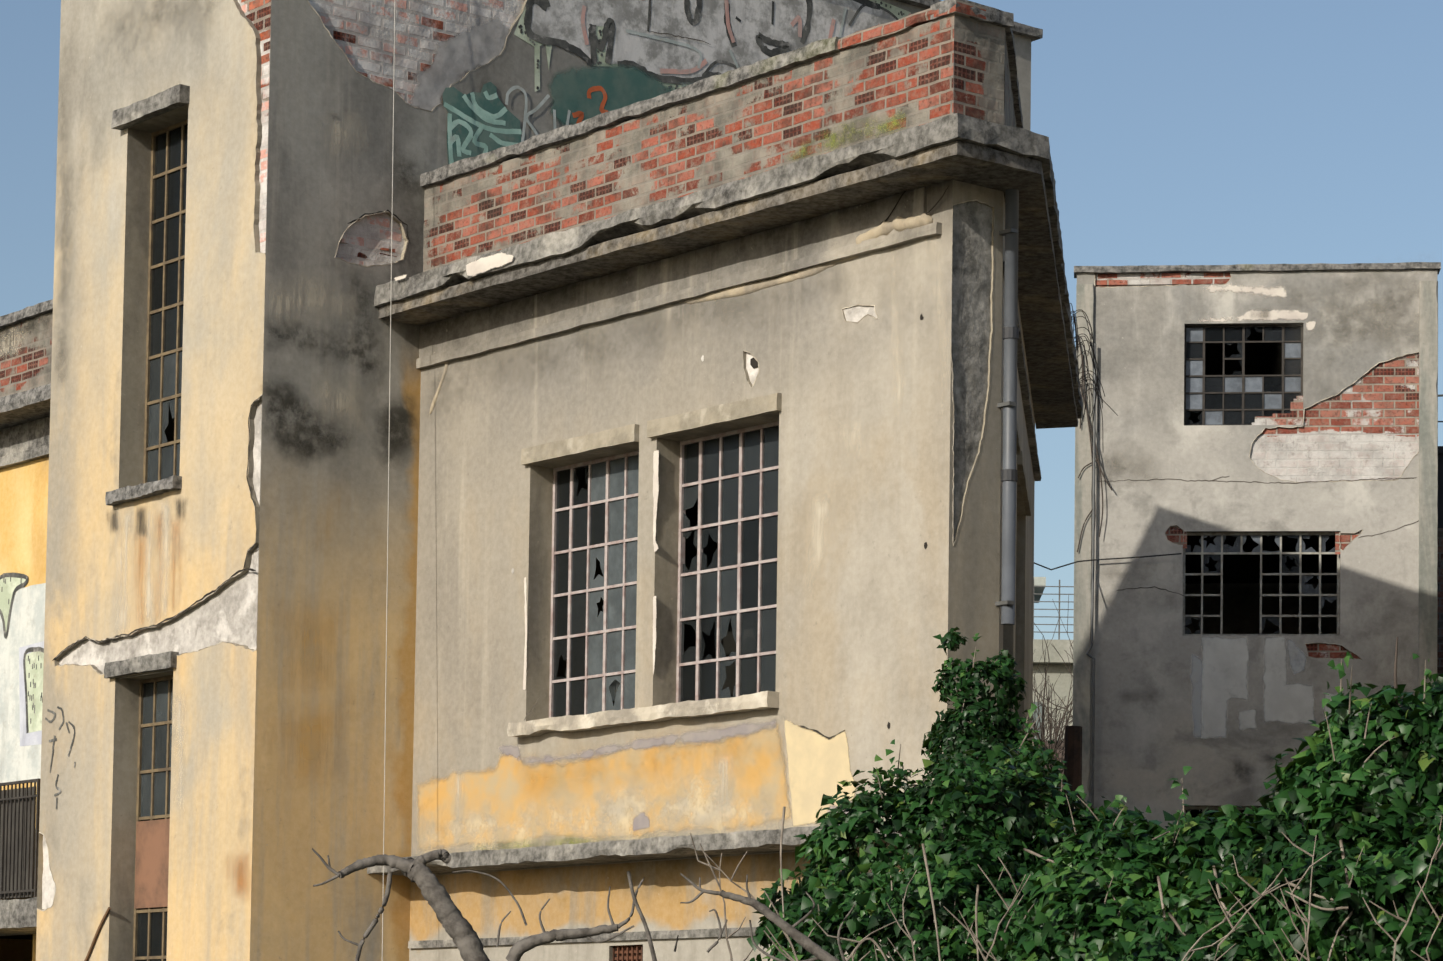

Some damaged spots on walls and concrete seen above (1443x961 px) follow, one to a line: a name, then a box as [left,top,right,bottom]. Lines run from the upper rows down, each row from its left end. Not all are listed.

flaking render [307,0,526,112]
flaking render [233,0,271,255]
flaking render [248,394,262,523]
damp [383,406,412,457]
flaking render [1249,352,1419,483]
flaking render [1165,525,1187,548]
flaking render [1335,530,1363,554]
flaking render [54,543,259,679]
flaking render [1305,642,1362,660]
peeling [417,720,856,850]